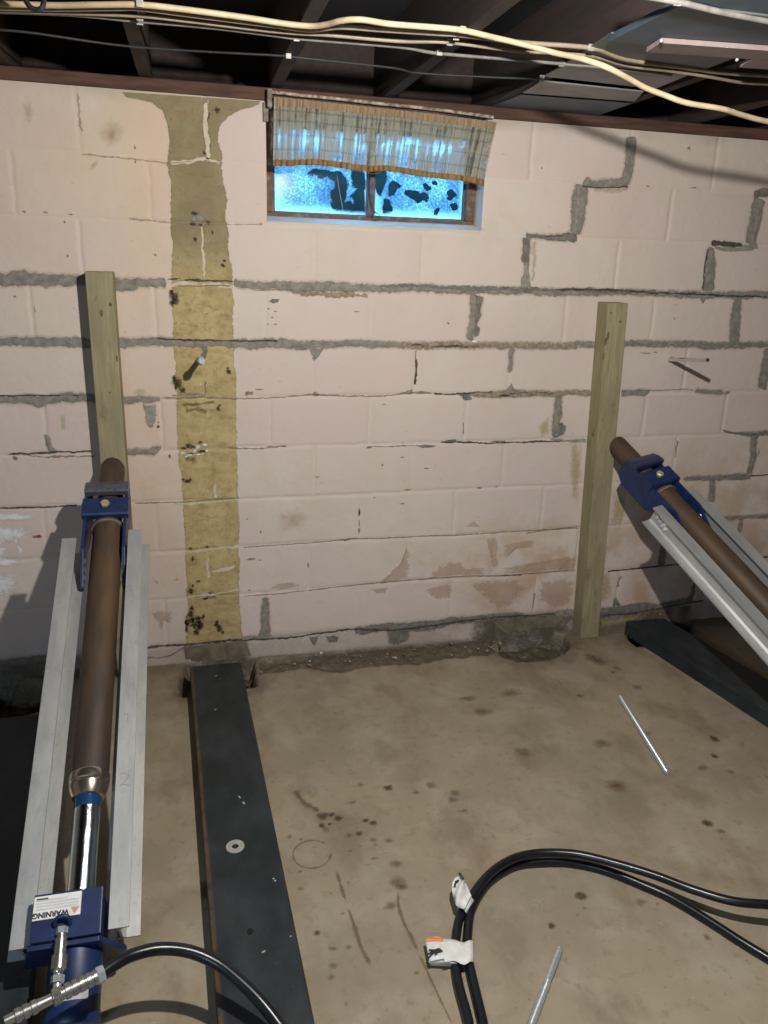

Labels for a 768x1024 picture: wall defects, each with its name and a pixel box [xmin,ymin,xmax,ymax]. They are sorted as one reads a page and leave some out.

crack [0,270,86,288]
crack [115,137,768,448]
crack [0,337,91,348]
crack [0,392,96,408]
crack [229,443,287,451]